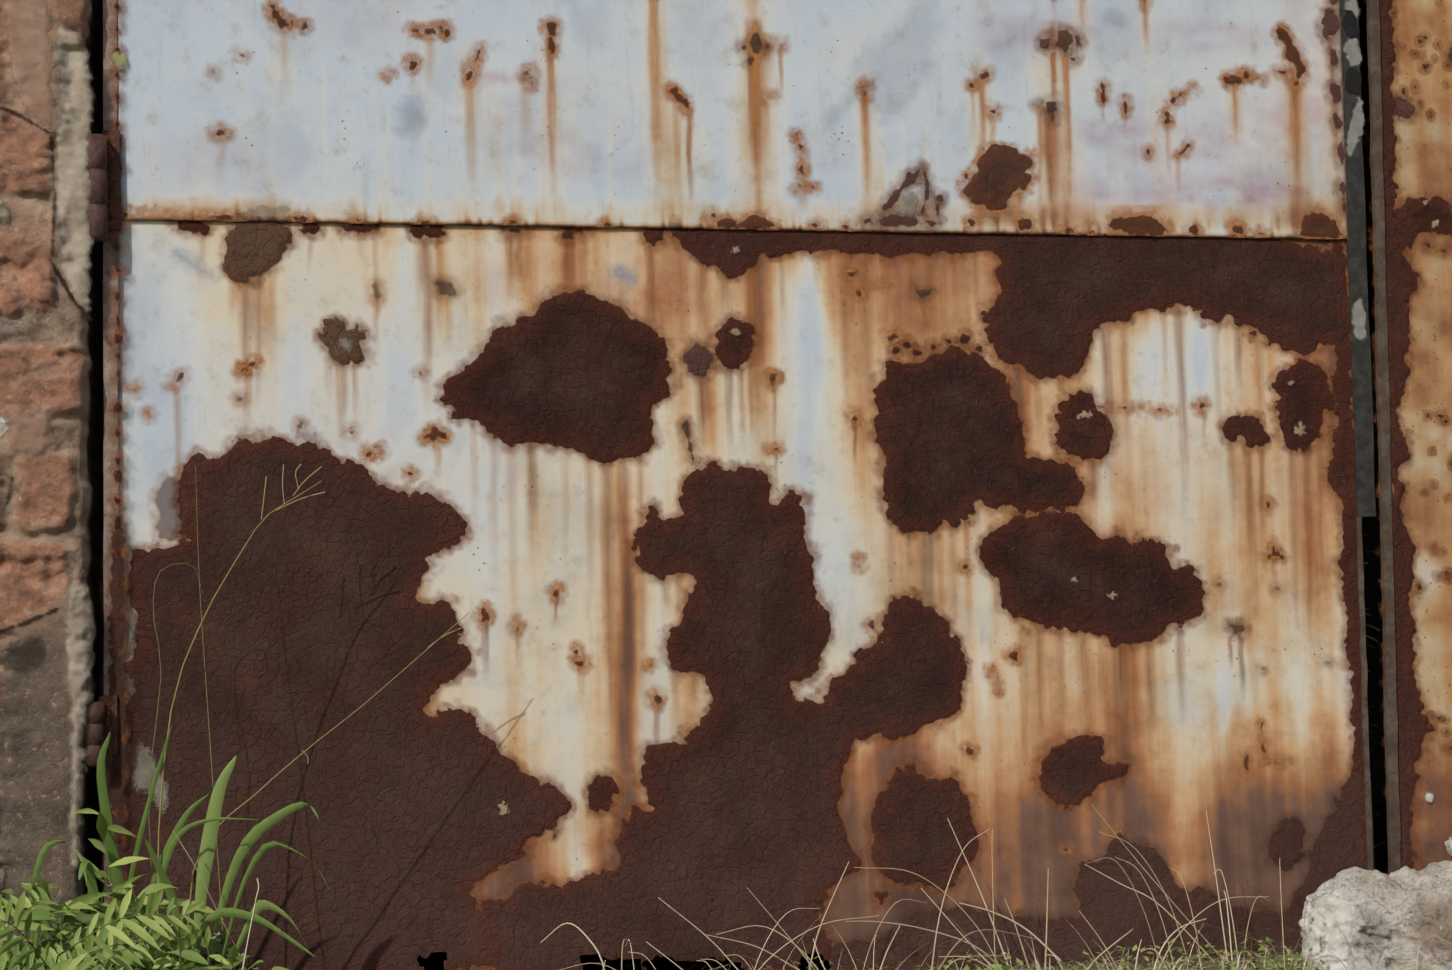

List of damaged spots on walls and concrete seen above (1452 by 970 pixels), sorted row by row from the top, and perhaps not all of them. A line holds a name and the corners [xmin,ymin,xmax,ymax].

rust [265,1,307,33]
rust [523,19,559,93]
rust [651,0,691,166]
rust [741,21,786,129]
rust [966,69,1000,118]
rust [1039,28,1081,148]
rust [1096,82,1132,117]
rust [1160,83,1195,127]
rust [1220,24,1308,169]
rust [1321,0,1346,165]
rust [1379,0,1452,870]
rust [107,101,1368,970]